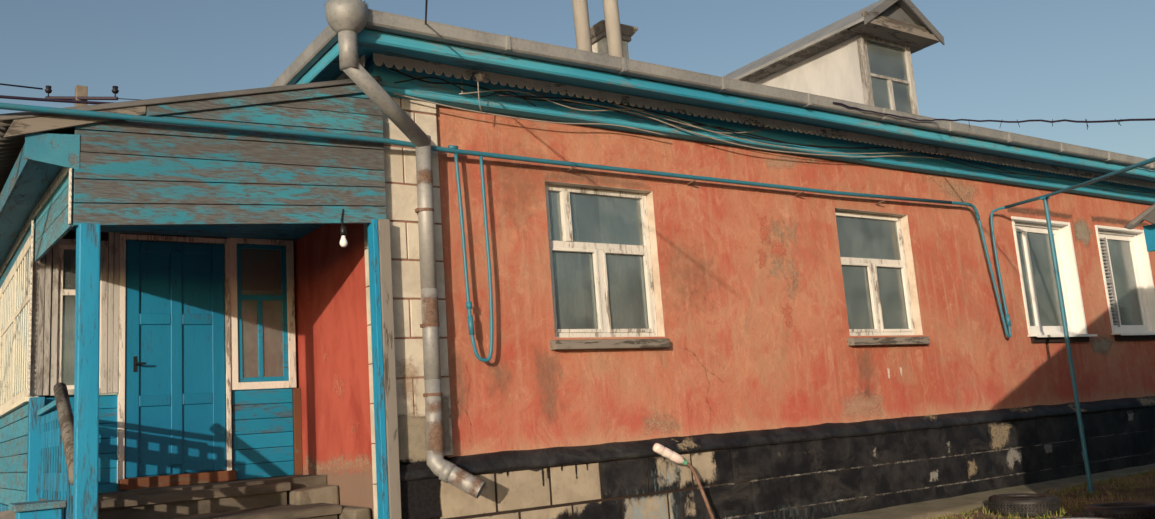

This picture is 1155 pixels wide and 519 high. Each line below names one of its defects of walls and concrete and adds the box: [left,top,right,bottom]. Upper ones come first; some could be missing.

rust [423,297,439,324]
rust [428,401,445,453]
peeling [989,423,1022,470]